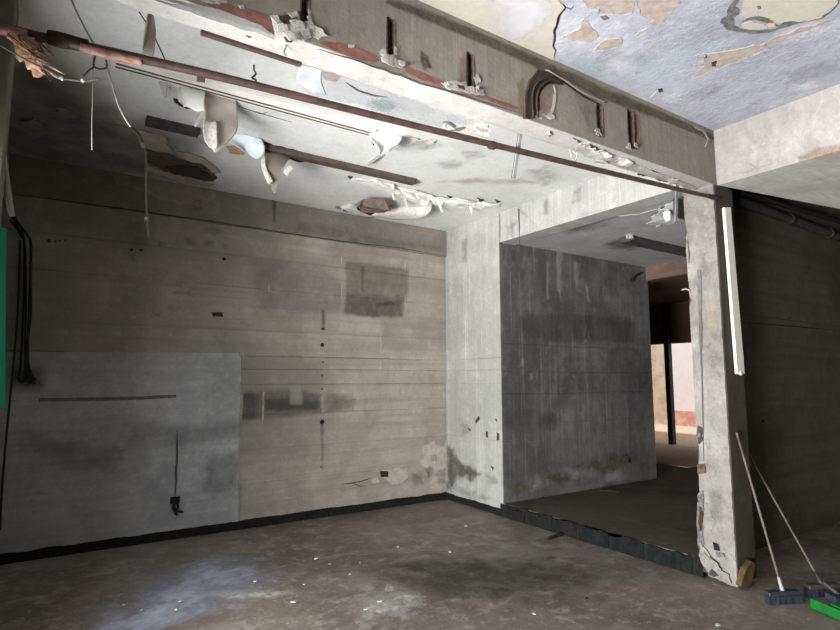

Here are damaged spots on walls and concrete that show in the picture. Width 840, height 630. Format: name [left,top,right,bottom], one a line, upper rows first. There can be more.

spalling [200,0,607,120]
peeling [562,0,680,53]
peeling [692,19,829,78]
spalling [112,125,221,188]
peeling [158,80,304,194]
peeling [569,138,698,190]
peeling [335,176,501,220]
damp [447,448,477,488]
spalling [696,490,731,584]